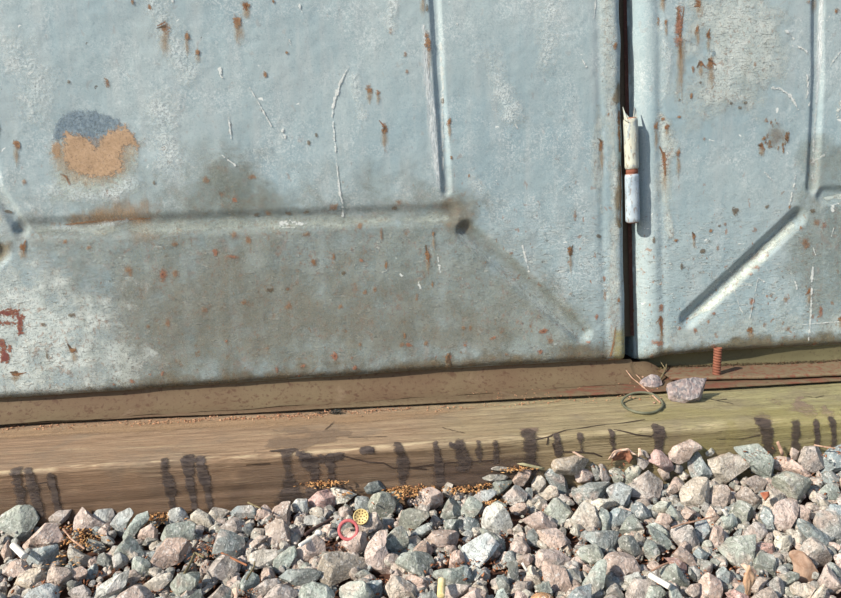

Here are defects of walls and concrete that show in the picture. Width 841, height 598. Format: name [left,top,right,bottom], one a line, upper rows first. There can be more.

corrosion [657,6,716,72]
peeling [49,110,139,200]
corrosion [758,119,790,153]
leakage [56,165,609,390]
leakage [0,386,113,398]